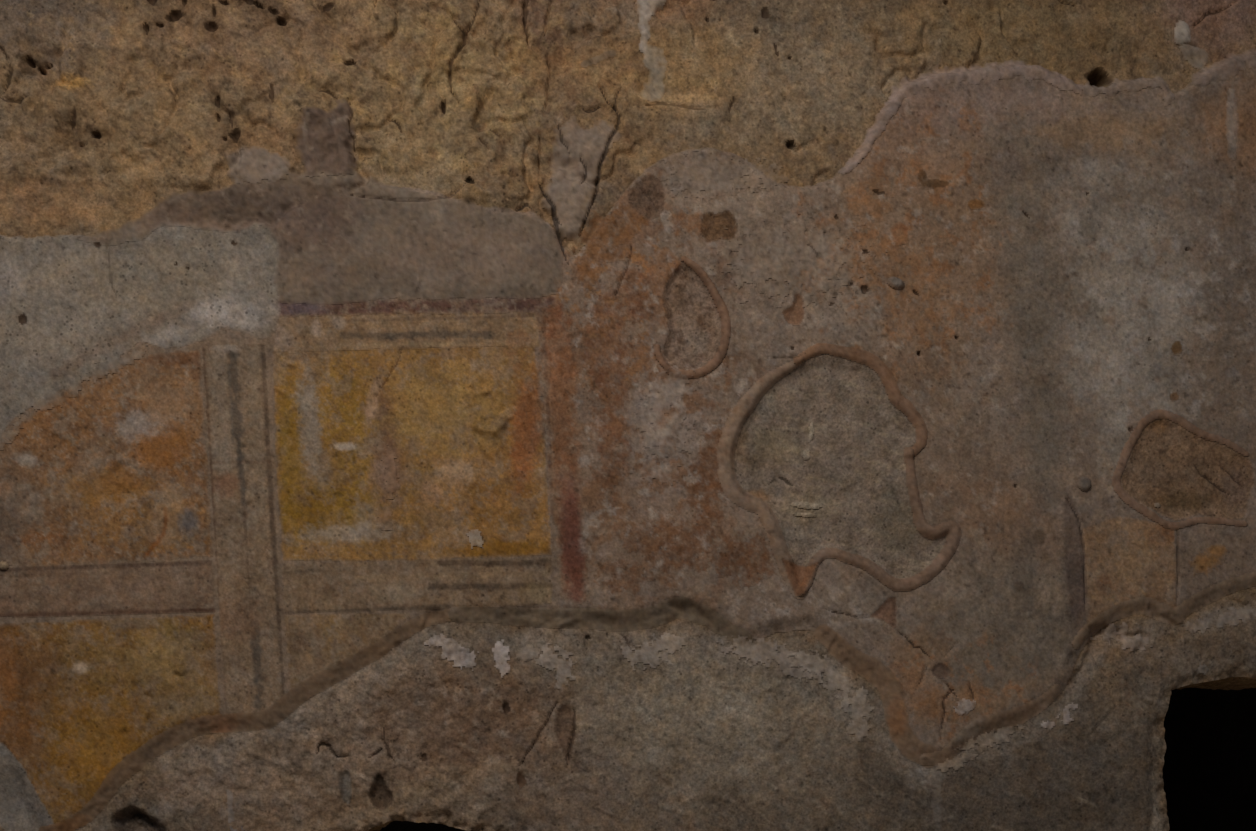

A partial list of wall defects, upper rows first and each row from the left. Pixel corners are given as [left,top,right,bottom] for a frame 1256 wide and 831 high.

spalling [134,0,301,48]
spalling [17,47,53,77]
crack [443,0,480,115]
spalling [62,90,112,154]
spalling [205,81,254,158]
crack [516,0,706,264]
spalling [627,174,666,221]
spalling [700,210,738,242]
crack [898,631,974,740]
spalling [368,772,394,811]
spalling [110,806,167,831]